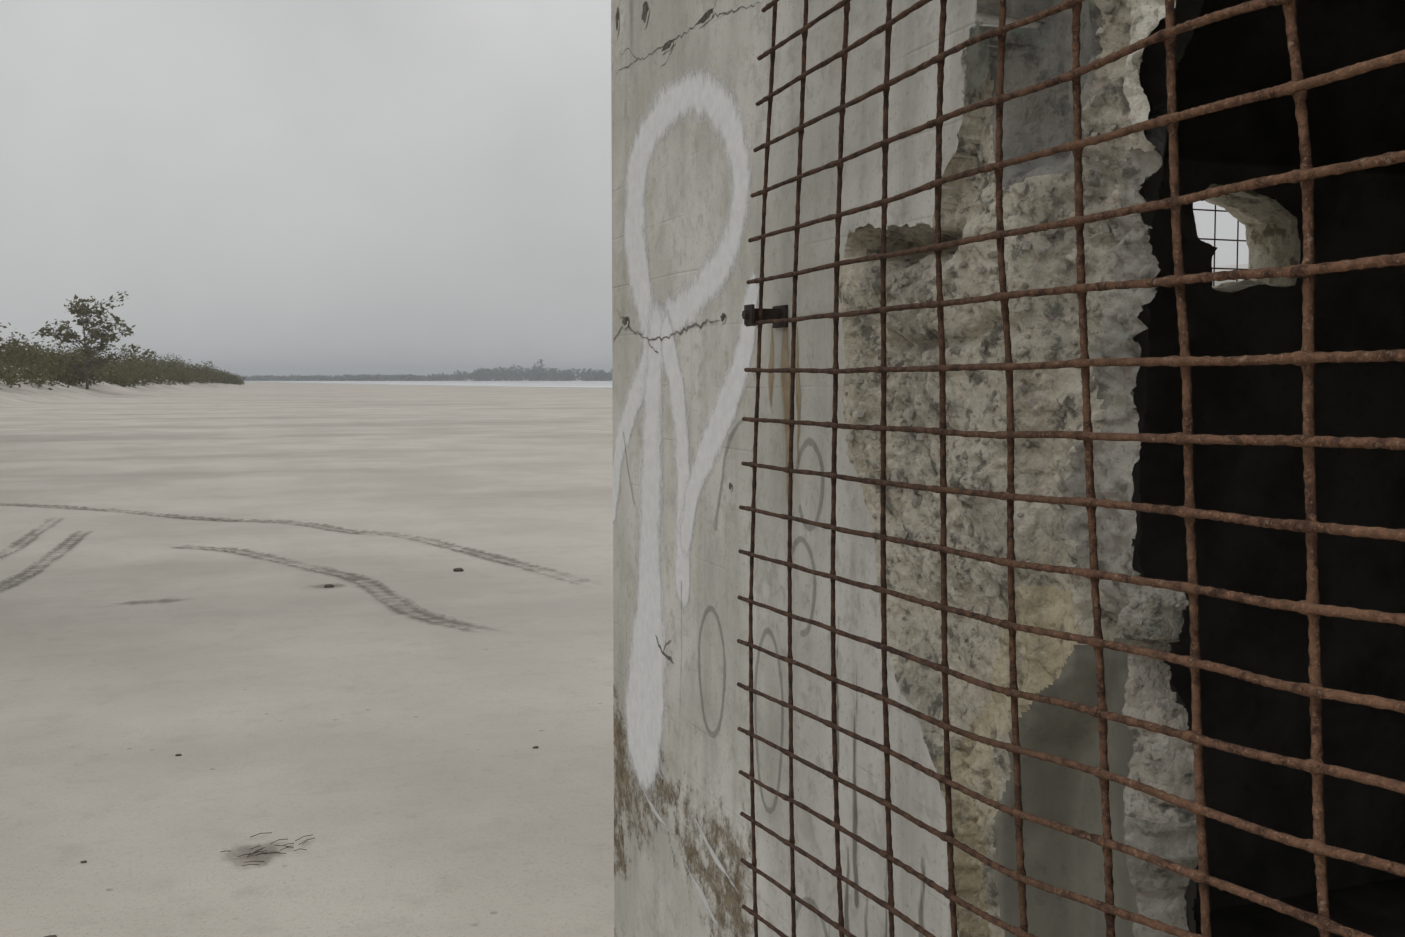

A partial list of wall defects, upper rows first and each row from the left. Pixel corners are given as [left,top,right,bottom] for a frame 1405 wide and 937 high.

crack [615,1,762,74]
crack [613,313,722,353]
corrosion [768,327,800,495]
spalling [839,0,1204,937]